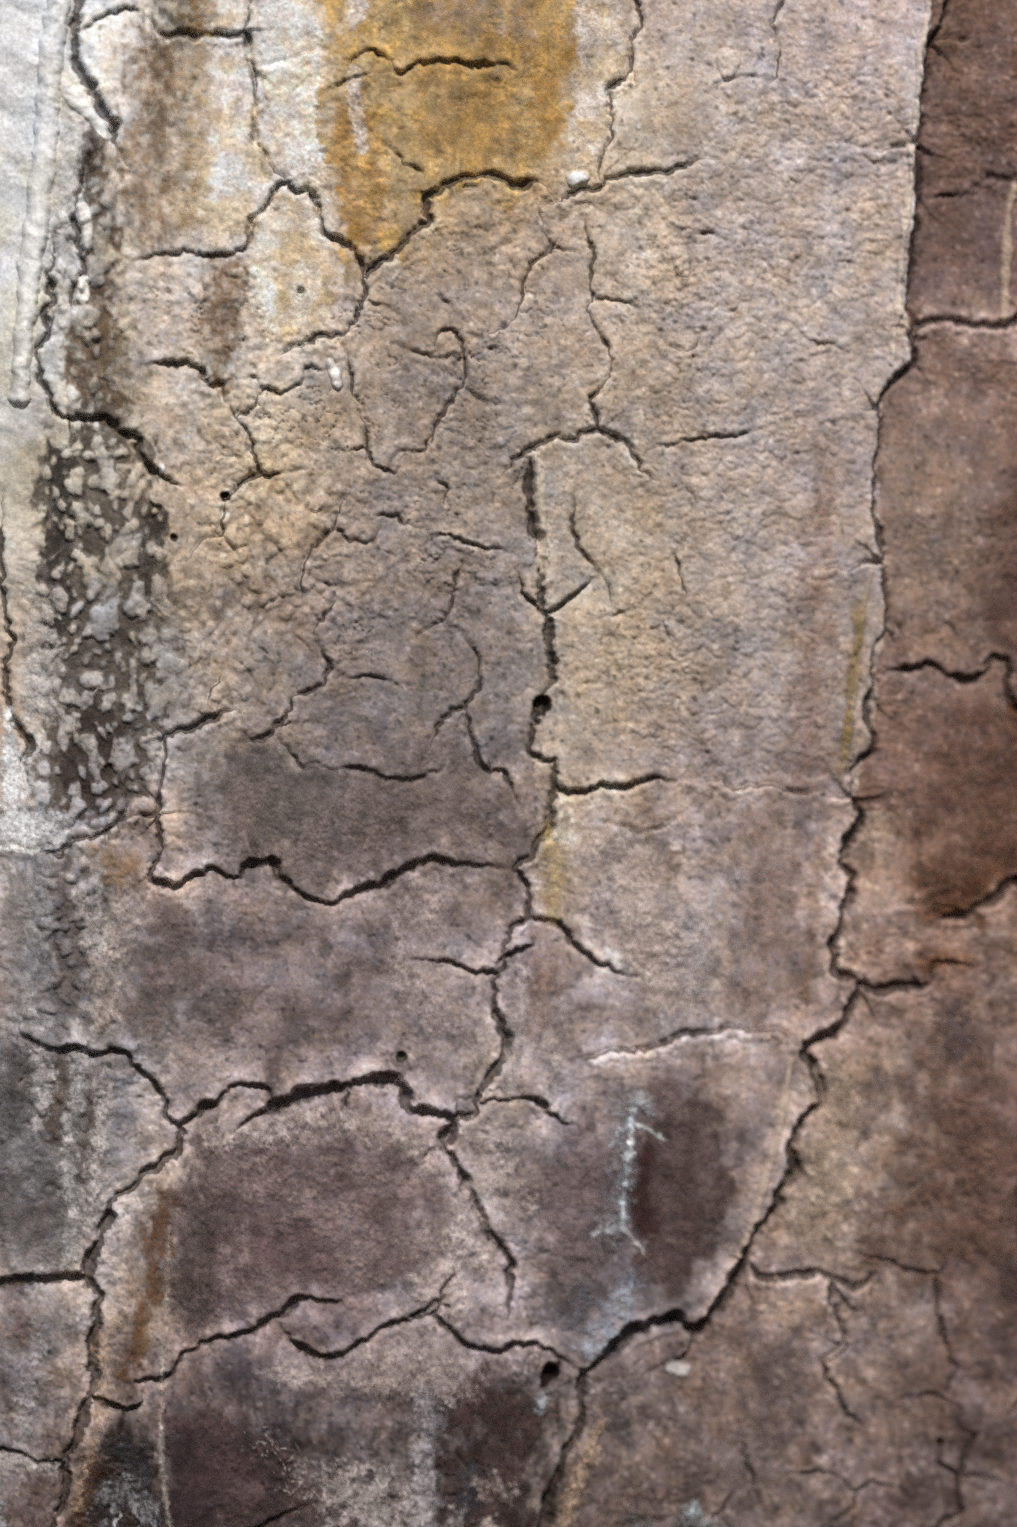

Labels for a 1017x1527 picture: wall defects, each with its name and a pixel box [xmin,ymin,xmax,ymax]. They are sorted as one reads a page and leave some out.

crack [34,163,176,484]
crack [69,0,700,537]
corrosion [315,0,592,282]
leakage [0,127,259,1271]
crack [0,229,665,1527]
leakage [213,720,549,1044]
leakage [505,967,530,1093]
crack [538,0,1017,1527]
leakage [0,1079,735,1527]